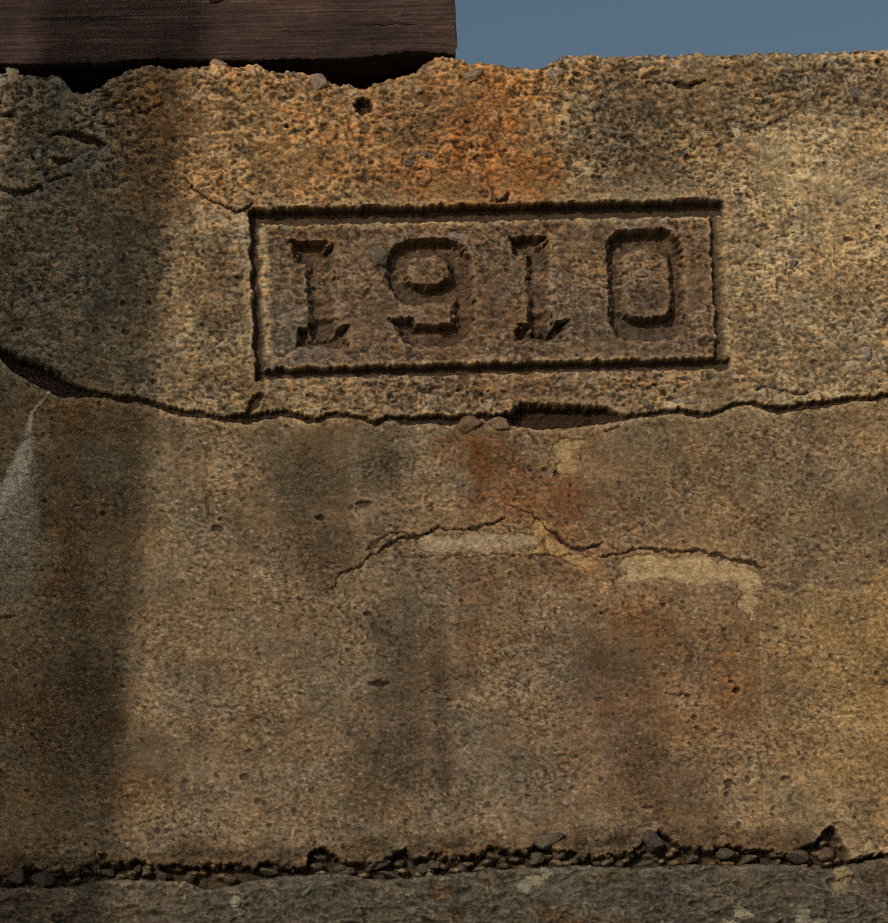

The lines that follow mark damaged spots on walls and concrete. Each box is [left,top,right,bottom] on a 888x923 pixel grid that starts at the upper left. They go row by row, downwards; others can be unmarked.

crack [0,350,888,432]
water stain [0,391,50,559]
crack [331,505,765,589]